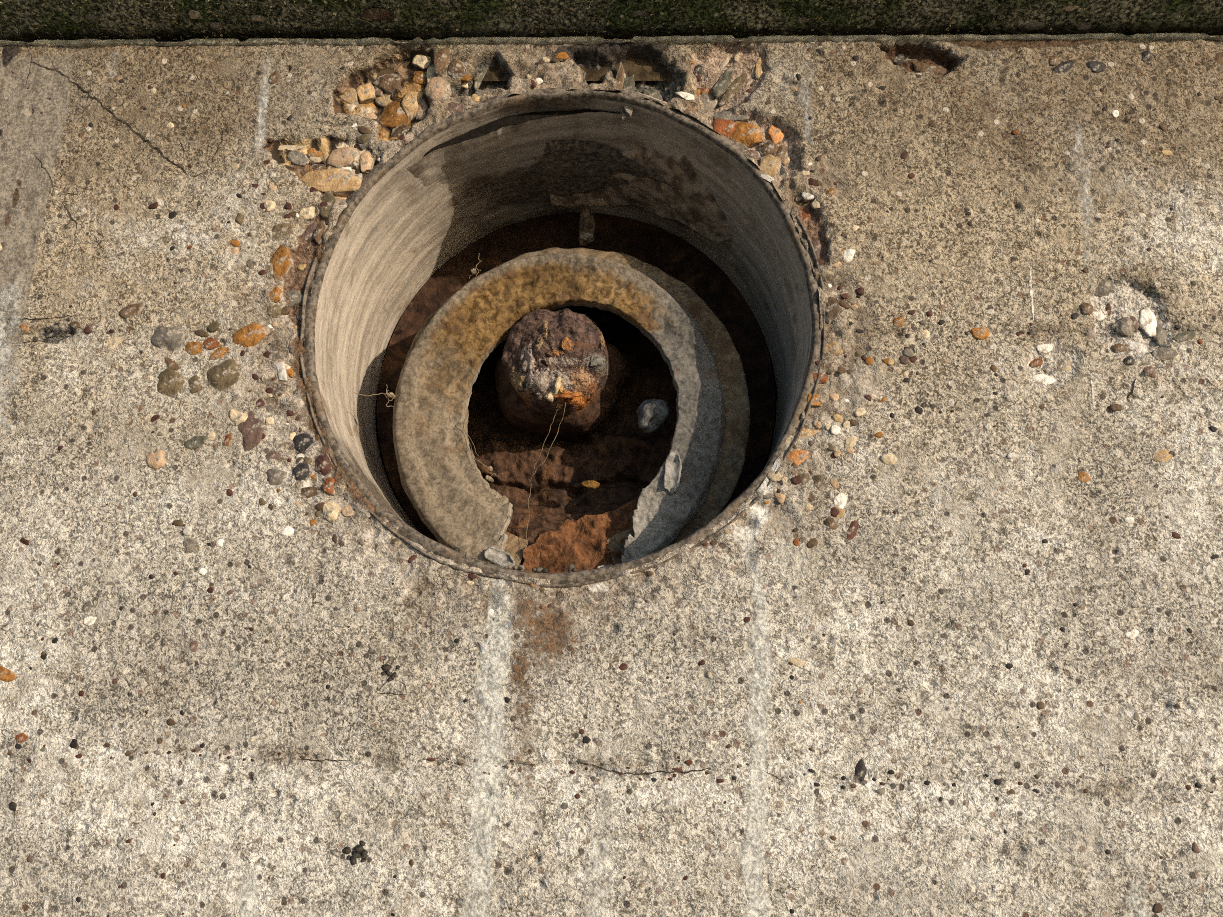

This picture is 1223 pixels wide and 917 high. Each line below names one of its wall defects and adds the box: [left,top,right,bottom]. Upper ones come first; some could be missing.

crack [25,51,227,177]
spalling [260,48,510,200]
spalling [576,45,803,188]
spalling [791,195,829,266]
rust [467,314,677,562]
damp [463,579,512,917]
rust [513,599,575,688]
damp [588,583,608,592]
damp [723,459,780,917]